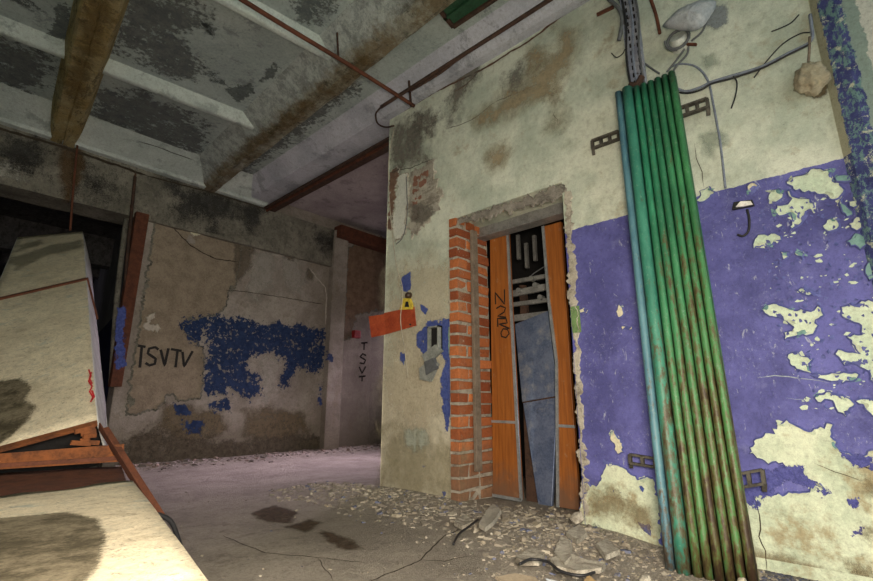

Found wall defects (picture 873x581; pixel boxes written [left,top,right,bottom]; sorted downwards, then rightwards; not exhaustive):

leakage [0,36,58,95]
leakage [90,88,211,153]
leakage [112,0,280,103]
leakage [392,109,437,171]
leakage [449,67,479,123]
leakage [476,30,575,124]
flaking render [380,158,444,242]
peeling [125,223,243,436]
flaking render [344,235,459,432]
peeling [457,184,663,547]
peeling [746,168,873,417]
peeling [747,418,873,581]